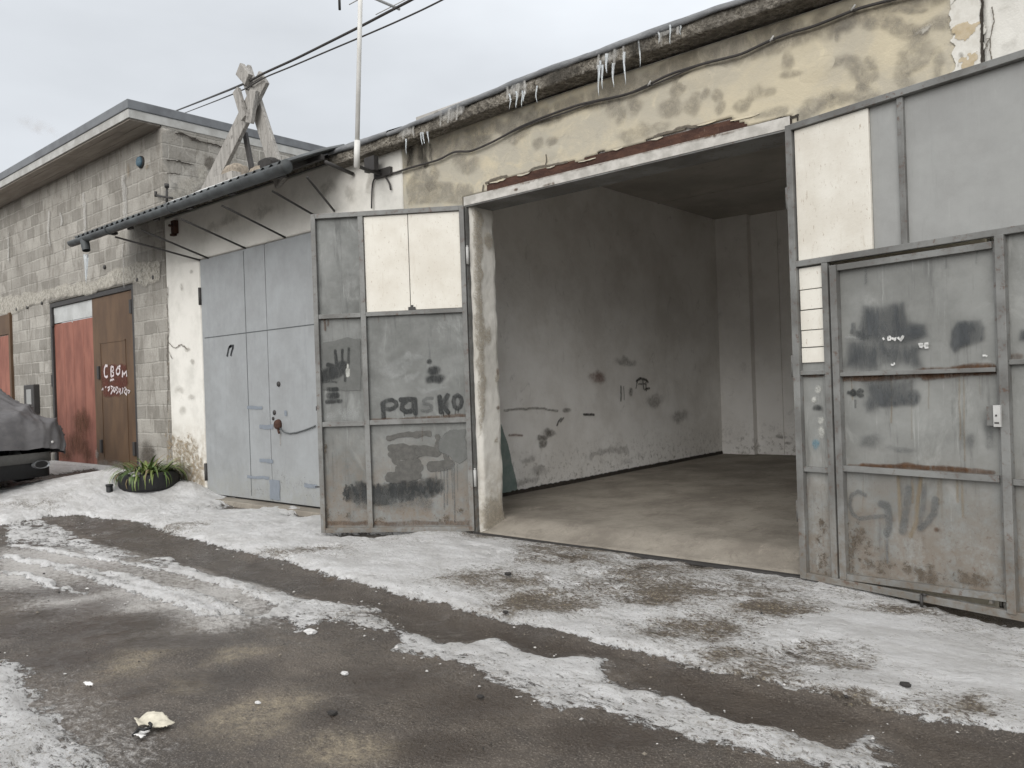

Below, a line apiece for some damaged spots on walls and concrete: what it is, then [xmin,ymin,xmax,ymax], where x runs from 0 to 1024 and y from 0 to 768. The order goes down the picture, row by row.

peeling [949,0,986,72]
damp [165,425,203,485]
corrosion [858,463,994,474]